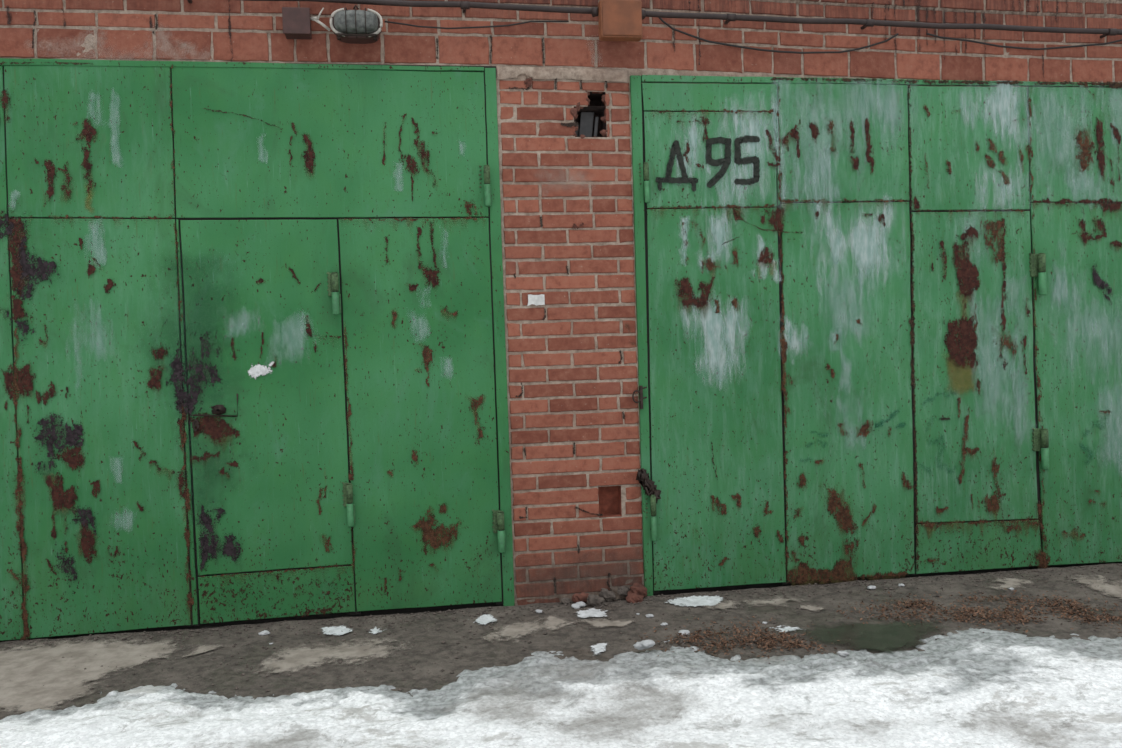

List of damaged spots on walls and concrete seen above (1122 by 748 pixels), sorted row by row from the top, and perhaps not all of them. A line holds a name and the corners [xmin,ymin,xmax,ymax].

rust [1,215,68,640]
rust [46,446,100,564]
rust [87,258,116,293]
rust [35,118,179,266]
rust [132,405,355,624]
rust [305,321,354,481]
rust [382,114,437,201]
rust [413,503,462,567]
spalling [570,90,608,139]
spalling [598,486,622,517]
rust [647,86,1050,586]
rust [931,92,1122,429]